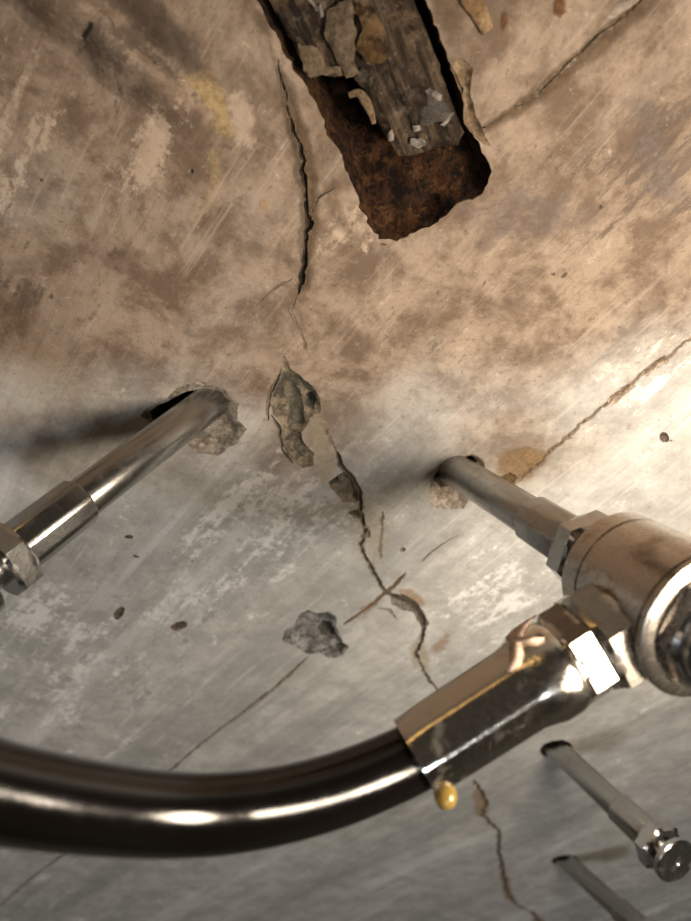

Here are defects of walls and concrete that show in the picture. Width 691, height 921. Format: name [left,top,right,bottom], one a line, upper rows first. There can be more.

damp [0,71,28,159]
damp [116,0,254,148]
crack [257,57,335,353]
damp [282,77,317,290]
spalling [257,0,492,242]
crack [478,0,642,130]
damp [485,0,656,130]
spalling [140,382,247,456]
spalling [266,352,322,468]
crack [514,336,691,484]
crack [324,425,458,690]
spalling [282,610,349,659]